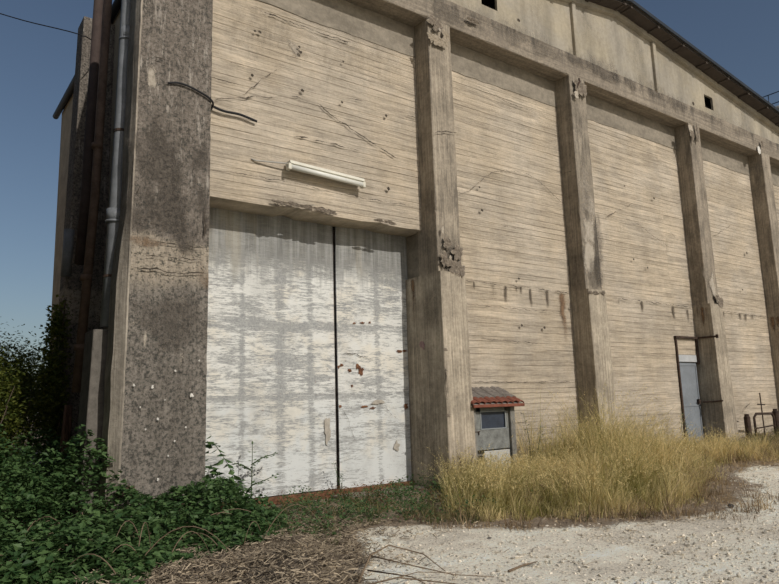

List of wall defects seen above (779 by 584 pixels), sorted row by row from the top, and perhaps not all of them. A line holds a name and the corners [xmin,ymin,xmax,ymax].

spalling [426,14,450,48]
crack [214,59,300,100]
spalling [574,78,587,98]
crack [294,103,396,158]
spalling [271,198,337,215]
crack [134,210,207,274]
spalling [440,226,465,278]